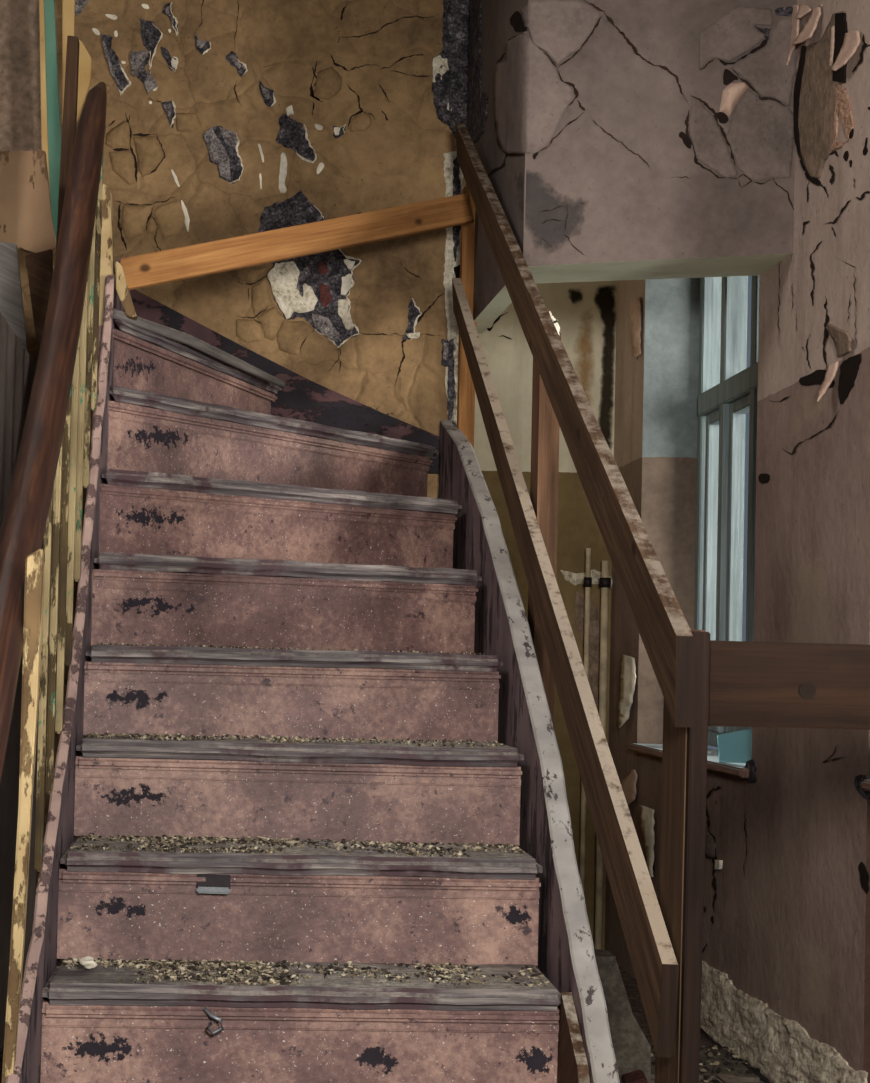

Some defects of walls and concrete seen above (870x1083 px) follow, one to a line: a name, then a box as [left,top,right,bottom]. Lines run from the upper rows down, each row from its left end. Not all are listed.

spalling [101,2,179,95]
crack [109,98,178,251]
spalling [259,81,317,163]
spalling [258,191,326,233]
crack [309,4,437,127]
crack [487,1,870,369]
peeling [679,5,868,185]
crack [237,276,270,336]
spalling [268,249,362,347]
crack [329,262,445,387]
crack [780,411,839,455]
peeling [700,960,868,1083]